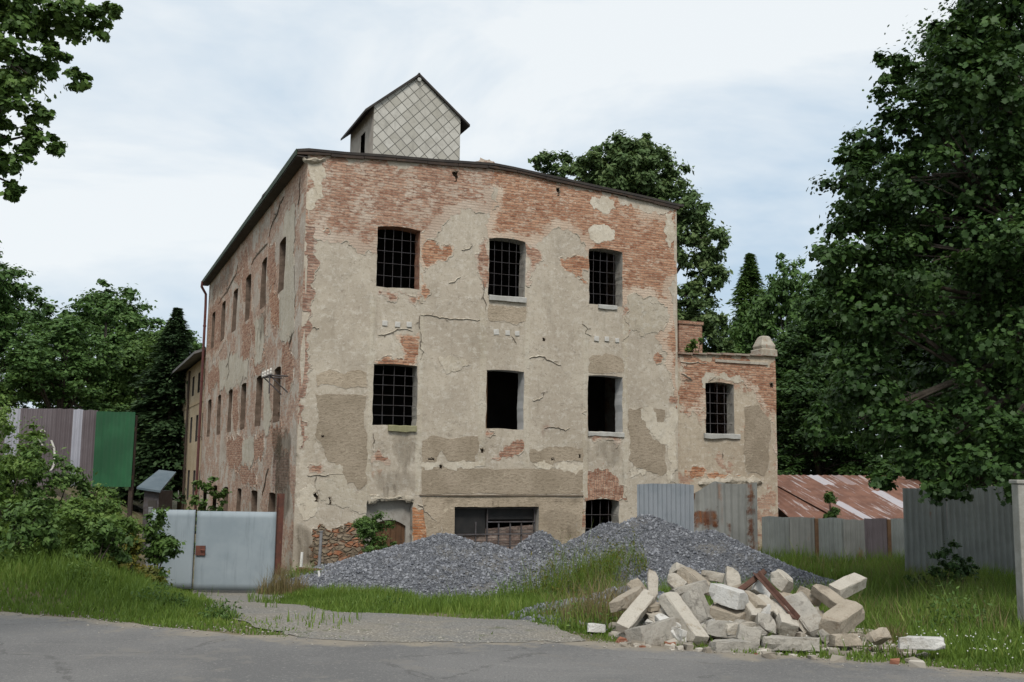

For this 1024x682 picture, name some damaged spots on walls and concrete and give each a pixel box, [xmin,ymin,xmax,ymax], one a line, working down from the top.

crack [379,276,487,360]
flaking render [206,155,778,567]
corrosion [694,511,730,536]